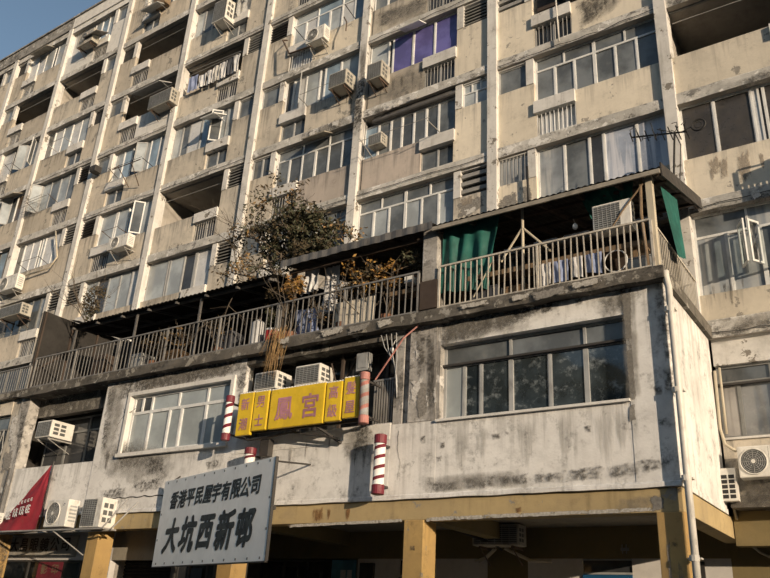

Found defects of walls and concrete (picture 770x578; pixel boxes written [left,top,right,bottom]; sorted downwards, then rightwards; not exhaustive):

leakage [582,0,615,21]
leakage [103,361,248,446]
leakage [106,447,163,489]
leakage [611,460,666,476]
leakage [434,475,527,489]